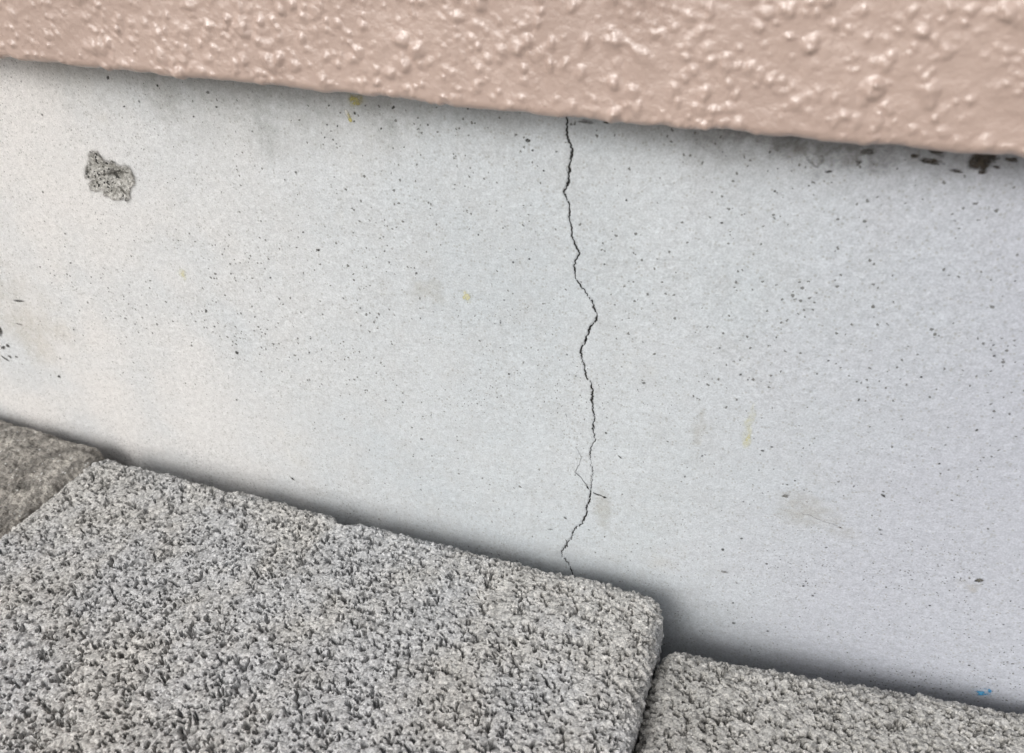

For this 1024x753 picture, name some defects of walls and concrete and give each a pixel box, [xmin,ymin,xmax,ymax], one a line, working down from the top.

spalling [85,151,135,201]
crack [561,117,606,578]